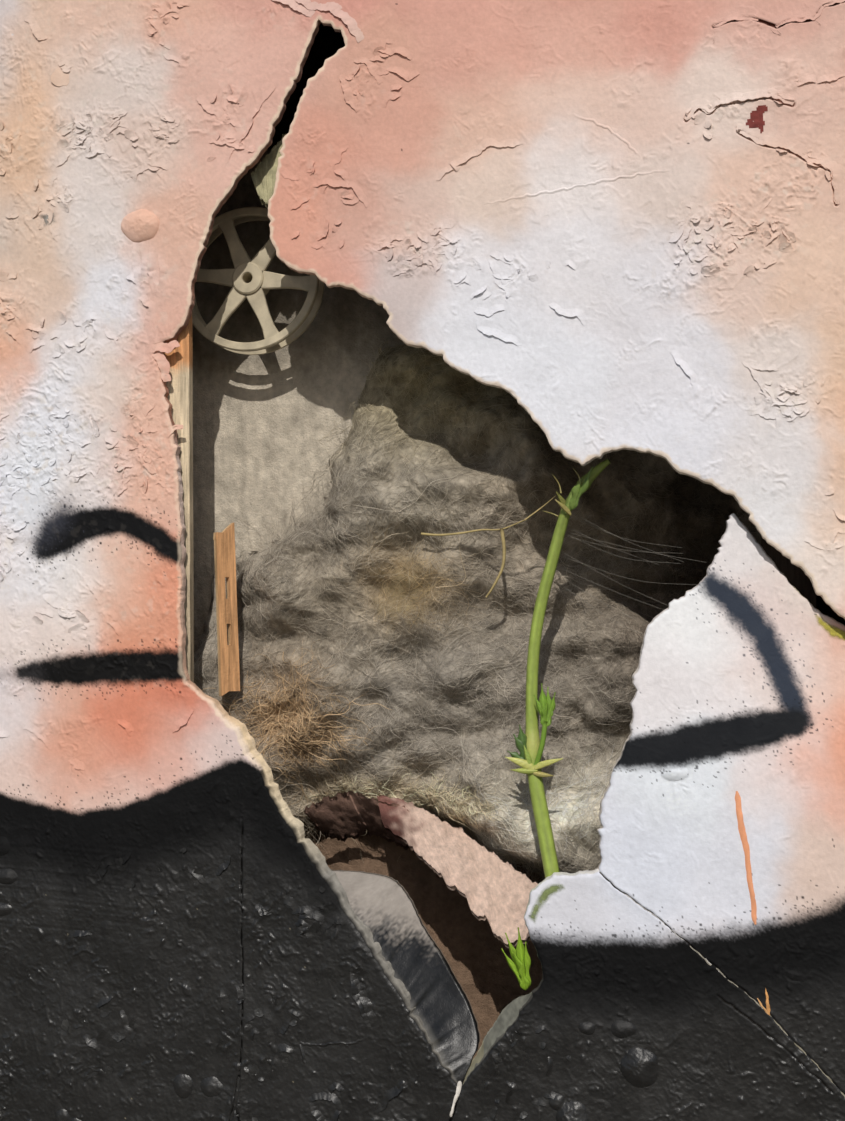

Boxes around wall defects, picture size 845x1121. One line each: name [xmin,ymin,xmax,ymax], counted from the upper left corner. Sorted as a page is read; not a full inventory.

crack [712,0,845,42]
spalling [196,0,364,164]
peeling [339,38,419,112]
peeling [681,71,845,205]
peeling [376,218,462,278]
peeling [667,196,796,277]
peeling [451,250,577,346]
peeling [741,360,821,431]
spalling [816,595,845,625]
peeling [255,886,350,947]
crack [230,822,244,1121]
crack [599,872,845,1097]